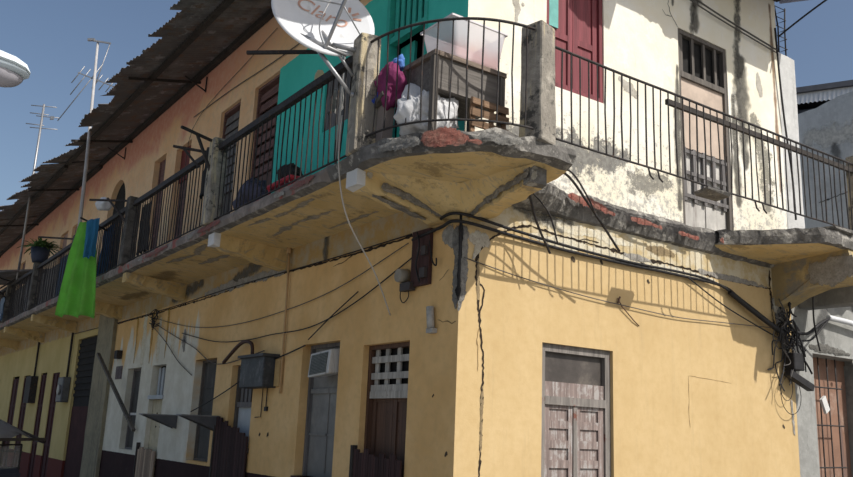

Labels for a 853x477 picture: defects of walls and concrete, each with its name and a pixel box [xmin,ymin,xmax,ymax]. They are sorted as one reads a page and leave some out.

peeling [512,0,525,22]
leakage [690,0,699,33]
leakage [731,0,775,219]
flaking render [378,126,524,152]
spalling [372,183,442,220]
spalling [469,171,537,215]
peeling [529,169,715,281]
spalling [442,223,490,311]
peeling [807,253,853,287]
crack [475,224,777,477]